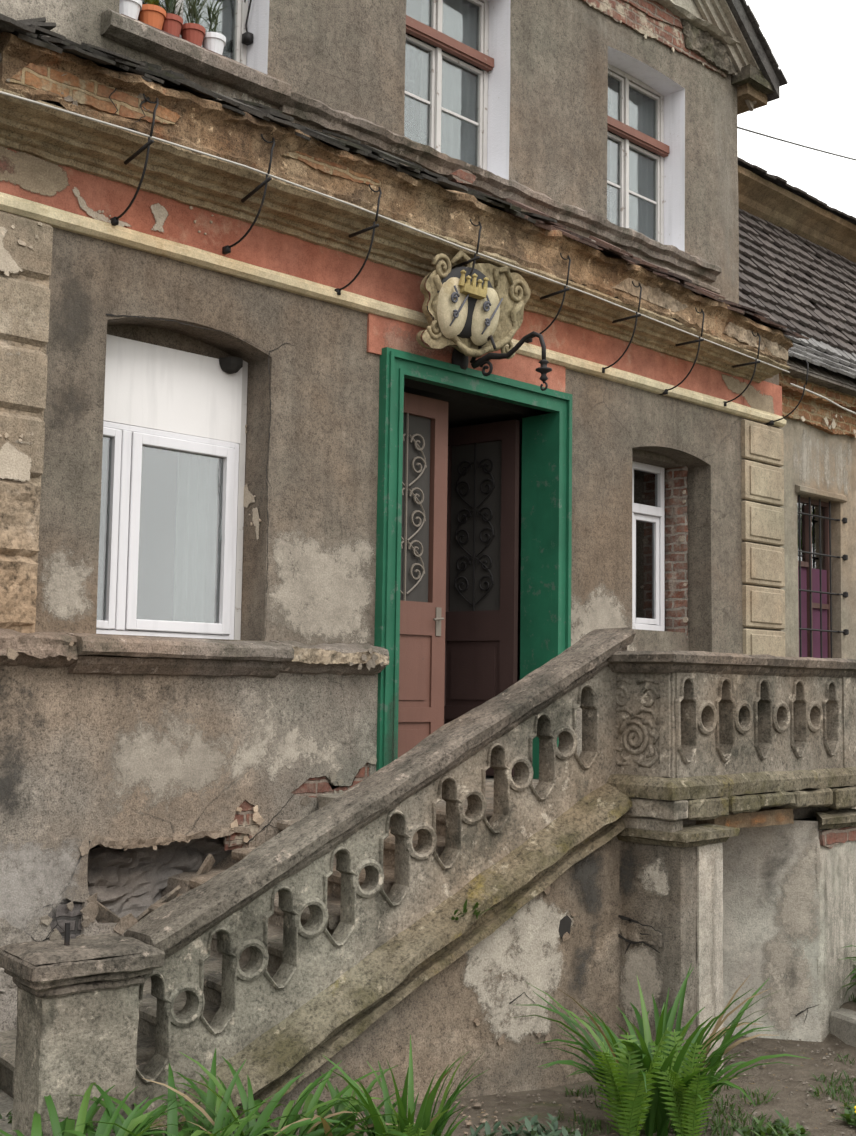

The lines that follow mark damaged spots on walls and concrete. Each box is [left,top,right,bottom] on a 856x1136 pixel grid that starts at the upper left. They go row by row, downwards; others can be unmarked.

flaking render [582,0,738,78]
flaking render [6,63,181,125]
flaking render [0,145,130,227]
flaking render [0,222,43,276]
flaking render [722,322,856,438]
flaking render [0,432,34,481]
peeling [243,483,262,540]
flaking render [268,531,378,671]
water stain [0,736,24,814]
spalling [79,800,265,856]
flaking render [40,878,99,941]
flaking render [464,886,576,1046]